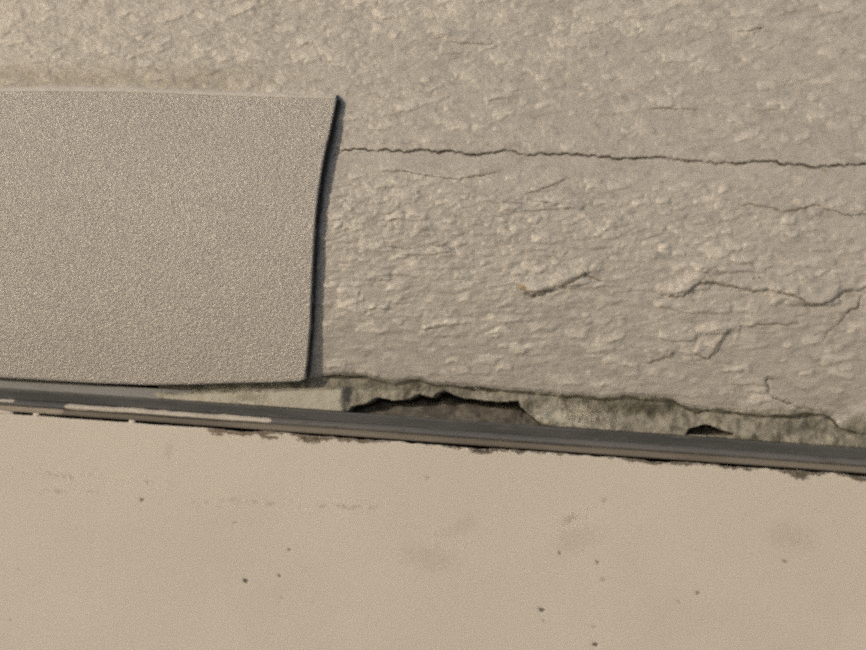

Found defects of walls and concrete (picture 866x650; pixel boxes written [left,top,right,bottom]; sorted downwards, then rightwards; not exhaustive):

crack [307,100,866,434]
spalling [353,392,548,426]
hole [686,424,732,435]